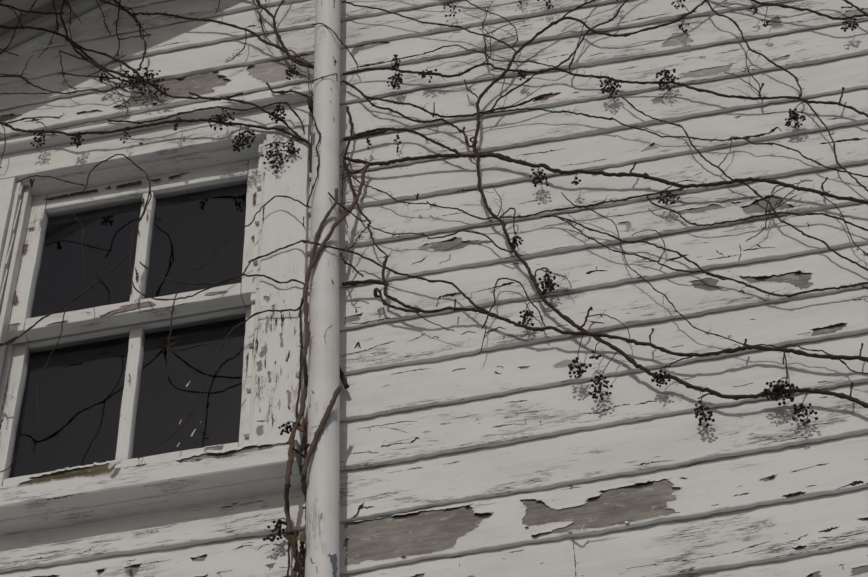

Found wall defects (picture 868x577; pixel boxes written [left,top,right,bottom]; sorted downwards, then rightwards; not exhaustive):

peeling [245,52,314,83]
peeling [0,70,233,142]
peeling [676,203,726,214]
peeling [738,193,796,215]
peeling [736,268,815,290]
peeling [263,295,276,327]
peeling [245,343,272,382]
peeling [17,460,121,486]
peeling [520,476,683,537]
peeling [327,503,495,577]